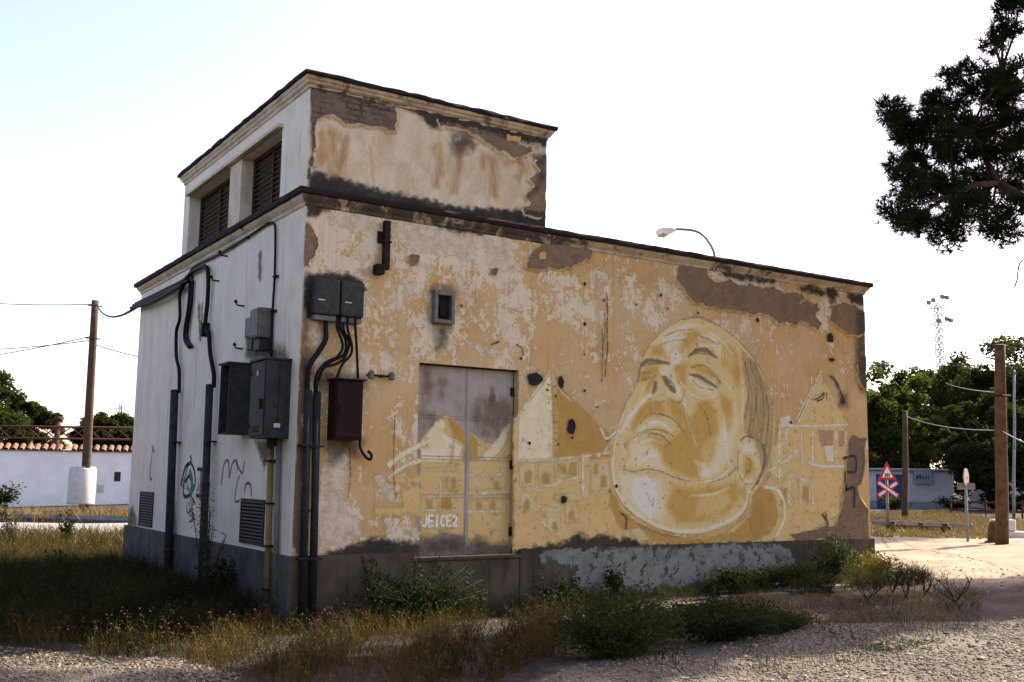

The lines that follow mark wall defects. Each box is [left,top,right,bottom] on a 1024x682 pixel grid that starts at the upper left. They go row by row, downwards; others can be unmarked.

spalling [307,87,400,180]
leakage [316,85,547,178]
leakage [307,171,545,227]
spalling [304,222,321,268]
peeling [329,210,377,318]
leakage [440,225,485,235]
peeling [394,220,594,276]
leakage [724,271,776,284]
spalling [673,264,866,342]
spalling [528,372,564,397]
peeling [538,435,869,593]